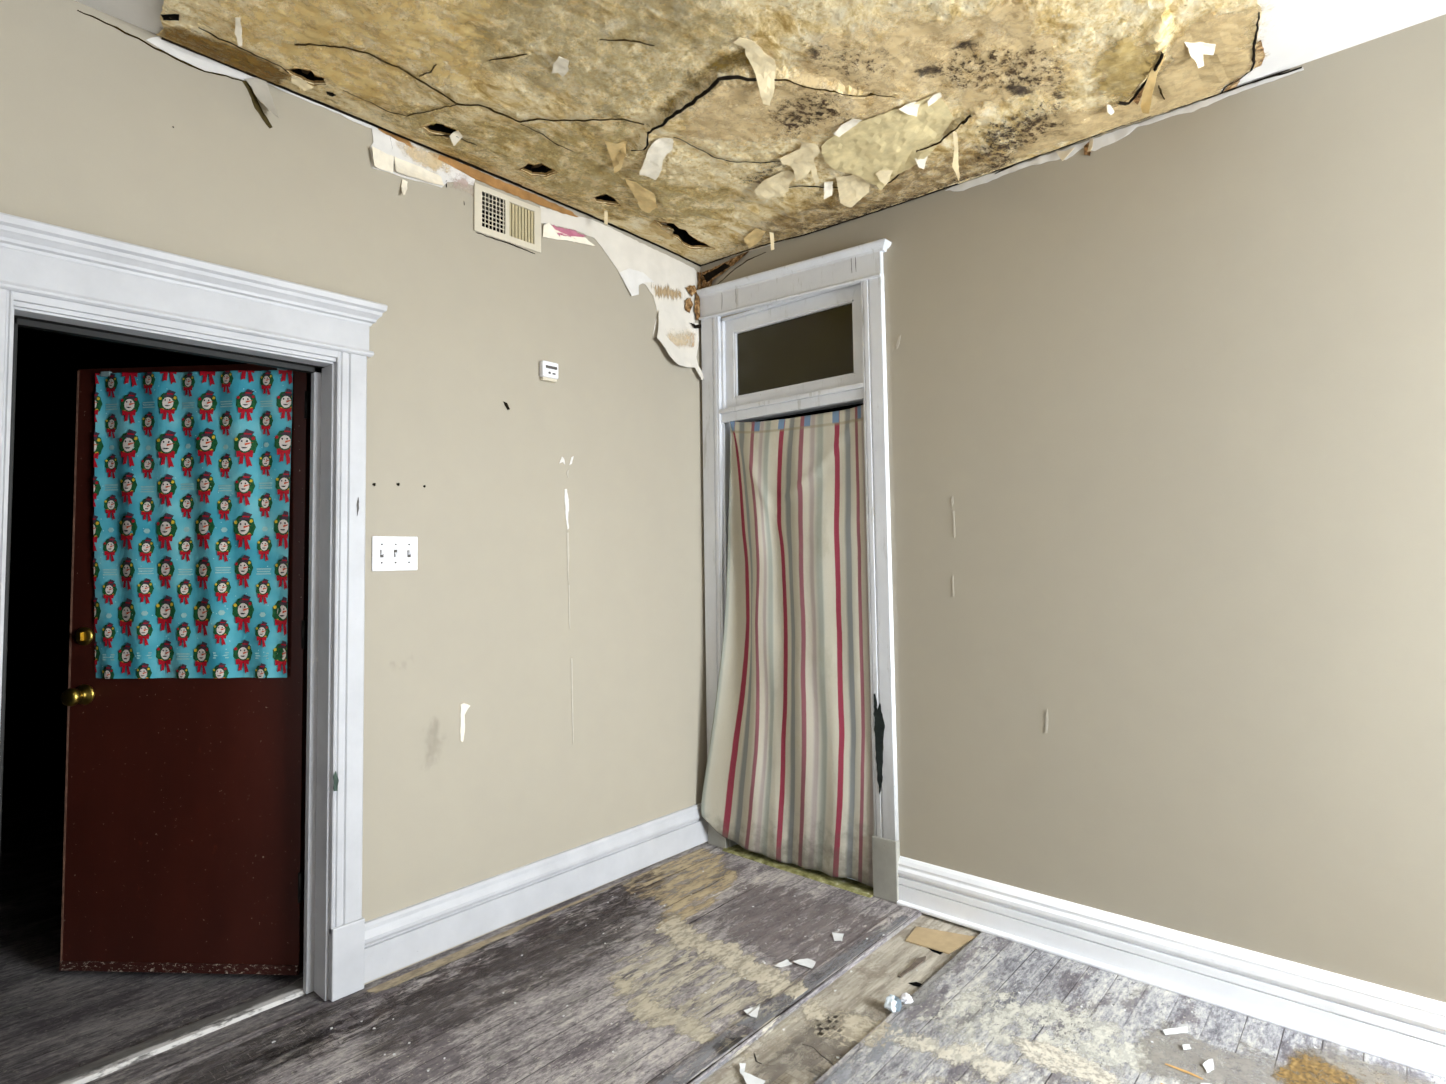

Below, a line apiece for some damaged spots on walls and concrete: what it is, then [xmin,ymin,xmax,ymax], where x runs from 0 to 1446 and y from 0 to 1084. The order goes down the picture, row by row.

peeling [235,17,243,47]
peeling [147,36,776,380]
crack [77,10,972,310]
peeling [754,142,893,207]
peeling [833,119,862,137]
peeling [899,92,942,117]
damp [665,3,1265,251]
peeling [945,40,1304,192]
peeling [874,694,885,794]